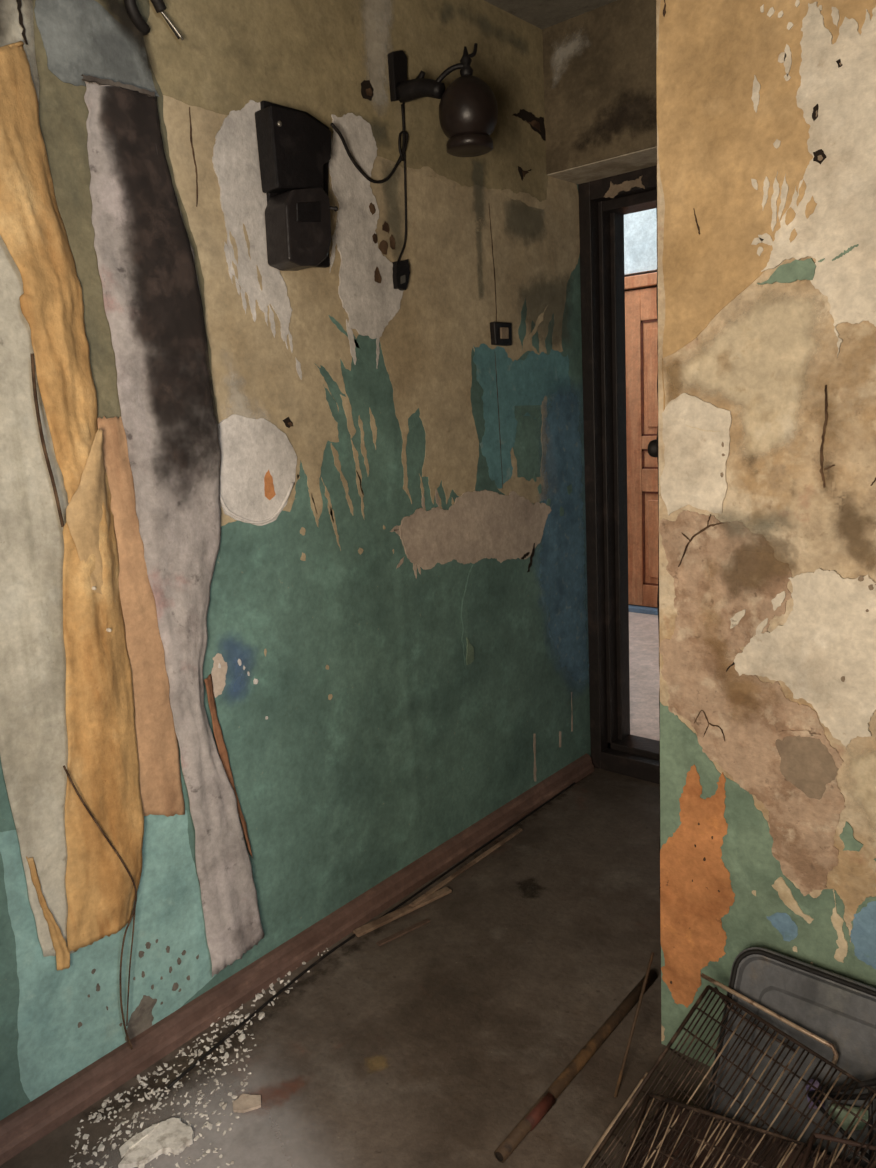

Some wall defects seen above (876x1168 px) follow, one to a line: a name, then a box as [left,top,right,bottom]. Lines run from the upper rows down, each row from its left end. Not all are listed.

peeling [760,0,800,30]
peeling [778,44,792,81]
peeling [751,75,761,113]
spalling [813,149,827,164]
peeling [751,171,798,256]
peeling [757,258,816,285]
peeling [224,242,302,380]
crack [819,385,835,488]
spalling [659,510,876,1067]